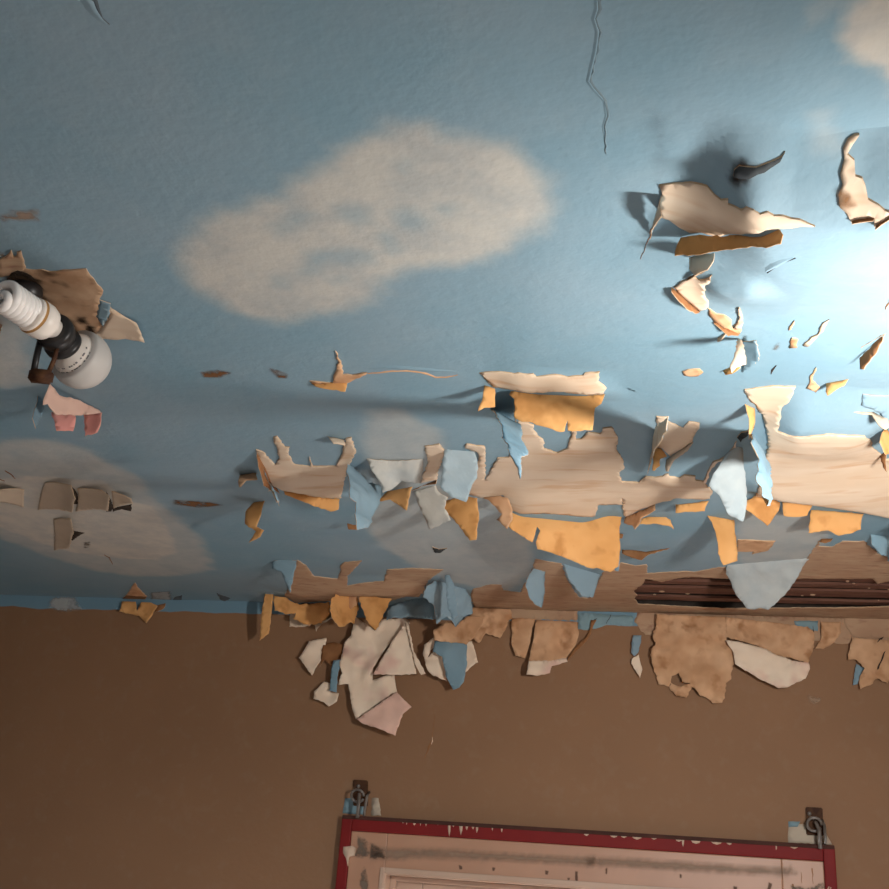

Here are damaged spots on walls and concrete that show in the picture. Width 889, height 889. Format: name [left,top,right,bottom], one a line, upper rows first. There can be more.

crack [79,0,110,25]
crack [586,0,610,155]
peeling [839,133,889,230]
flaking render [22,268,103,334]
peeling [310,350,367,392]
peeling [641,181,815,375]
peeling [788,319,830,348]
peeling [859,333,886,369]
peeling [32,384,102,436]
peeling [38,482,133,551]
peeling [238,368,889,703]
peeling [119,583,182,623]